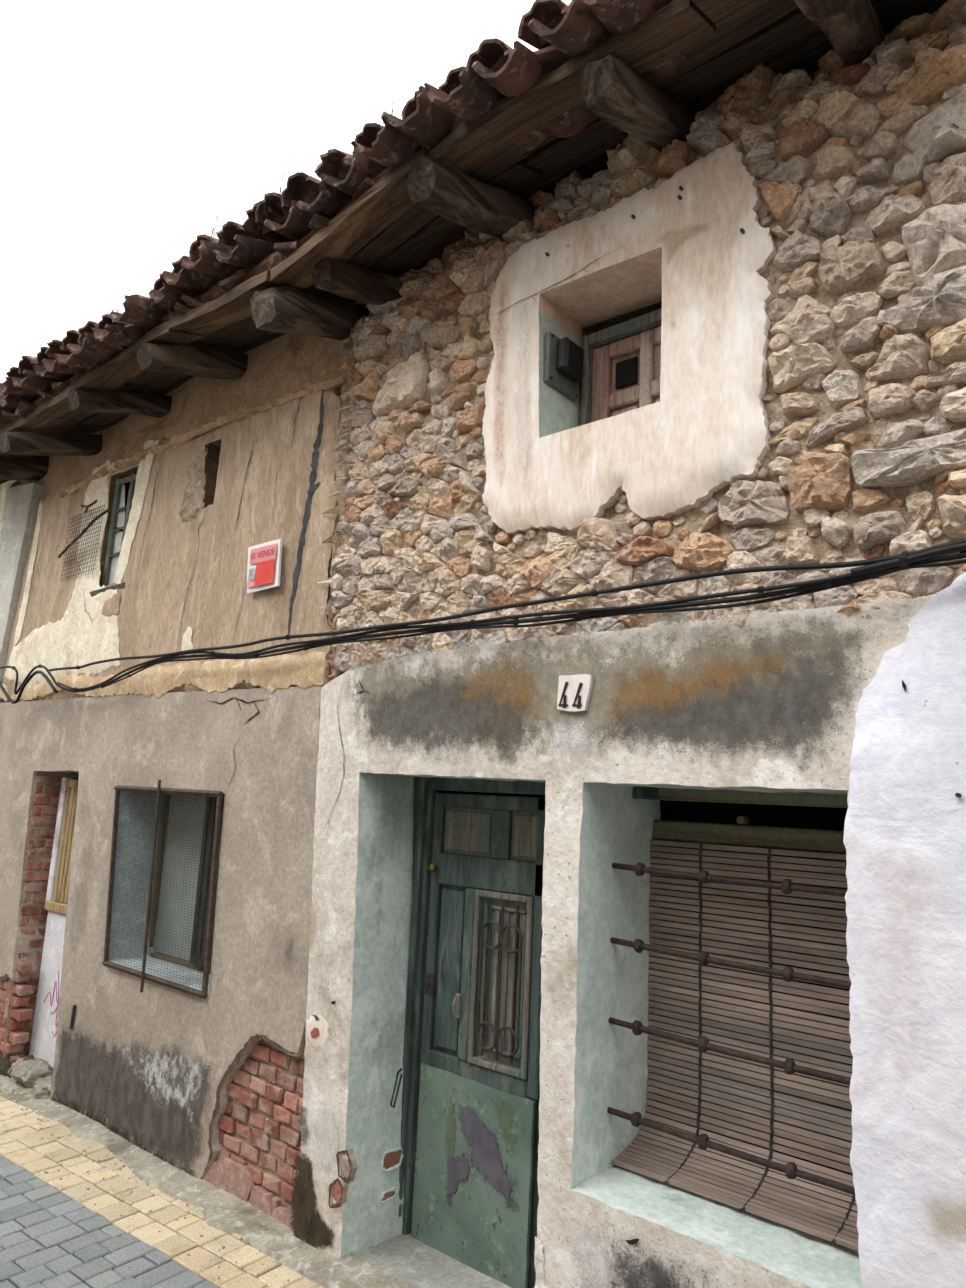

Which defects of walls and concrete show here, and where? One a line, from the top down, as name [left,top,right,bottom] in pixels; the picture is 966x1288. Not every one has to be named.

crack [177,390,332,645]
flaking render [181,627,193,655]
crack [208,697,270,786]
water stain [353,614,862,769]
spalling [0,955,53,1099]
water stain [52,1032,211,1176]
spalling [200,1013,329,1228]
spalling [328,1148,358,1209]
water stain [574,1232,710,1288]